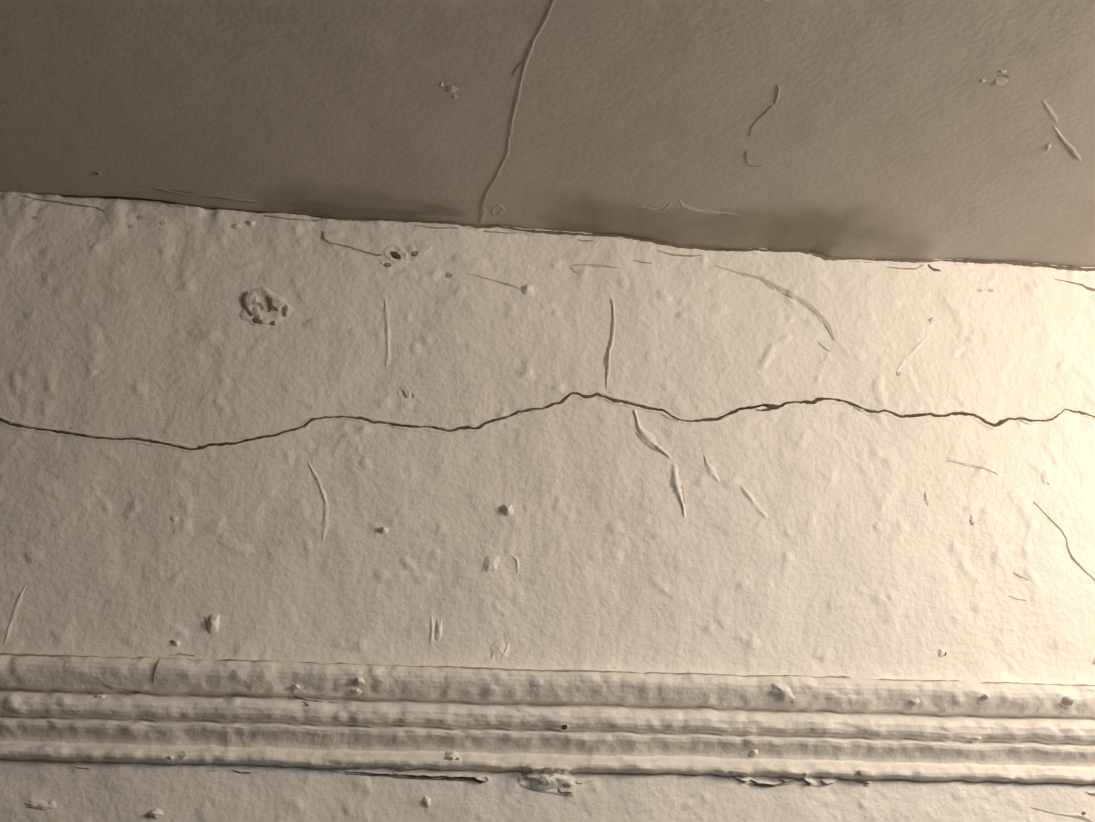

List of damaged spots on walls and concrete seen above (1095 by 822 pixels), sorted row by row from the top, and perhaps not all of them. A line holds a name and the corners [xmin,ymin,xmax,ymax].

crack [0,0,1095,300]
crack [0,299,1095,453]
crack [1033,502,1095,582]